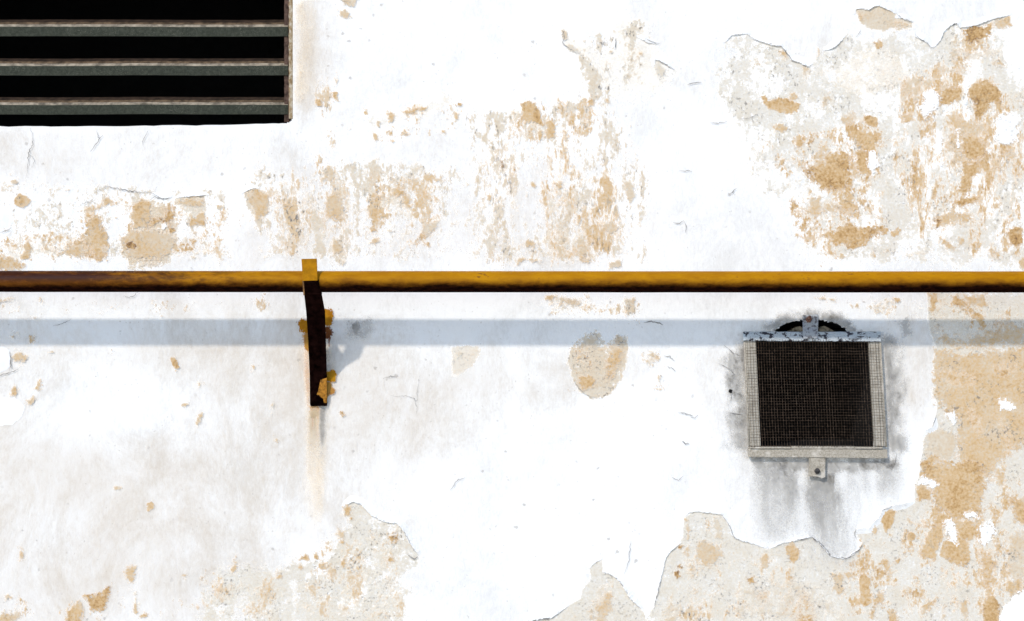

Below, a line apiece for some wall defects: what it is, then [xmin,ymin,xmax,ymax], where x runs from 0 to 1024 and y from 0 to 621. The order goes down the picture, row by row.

peeling [0,15,677,271]
peeling [714,0,1024,271]
peeling [59,495,421,621]
peeling [523,292,1024,621]
leakage [763,310,856,332]
leakage [724,317,912,530]